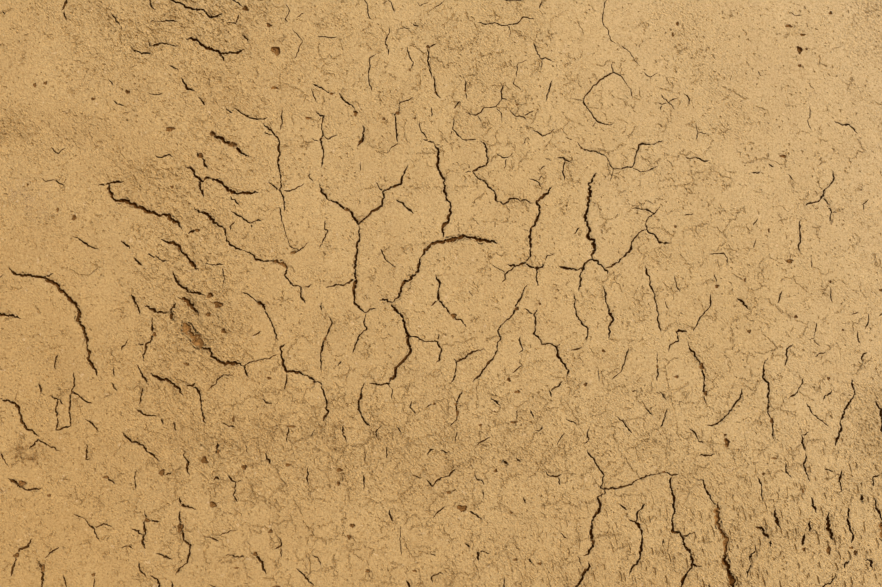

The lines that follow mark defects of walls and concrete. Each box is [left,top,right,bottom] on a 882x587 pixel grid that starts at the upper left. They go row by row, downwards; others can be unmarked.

crack [834,120,858,134]
crack [752,163,793,180]
crack [796,169,836,268]
crack [0,0,744,520]
crack [736,297,750,310]
crack [761,311,882,587]
crack [490,397,782,587]
crack [9,538,68,587]
crack [73,497,322,587]
crack [387,508,403,555]
crack [405,553,444,587]
crack [465,543,490,561]